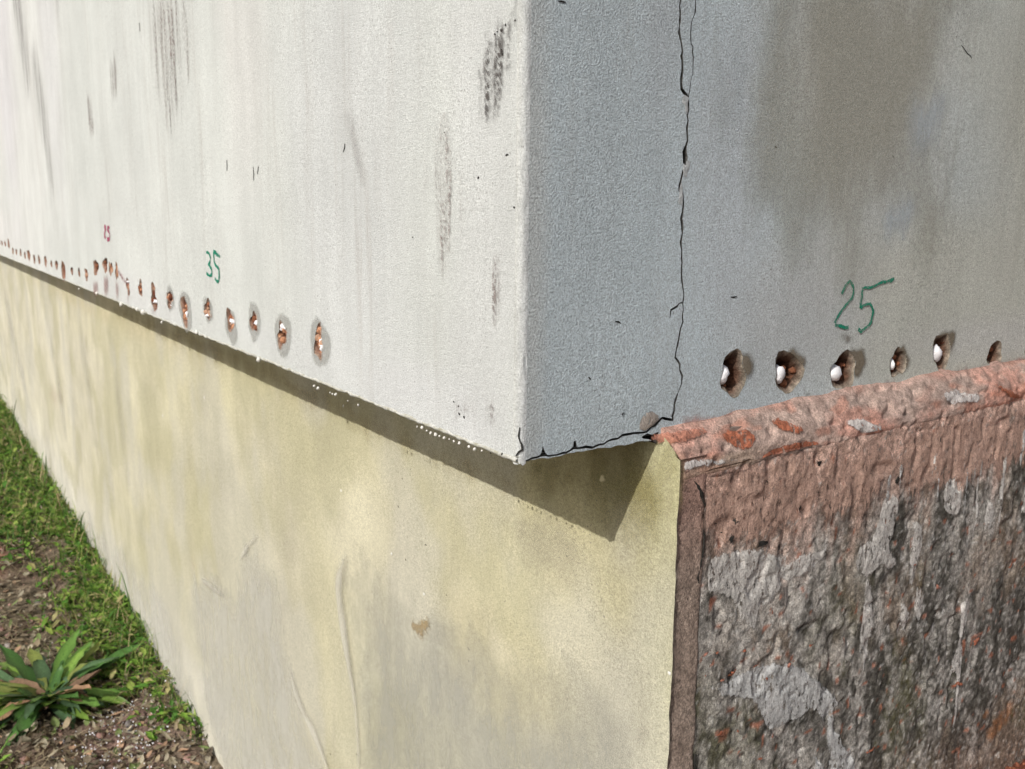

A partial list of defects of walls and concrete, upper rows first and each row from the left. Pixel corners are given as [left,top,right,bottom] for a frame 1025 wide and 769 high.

damp [154,2,188,94]
damp [483,25,510,115]
crack [515,0,696,461]
damp [113,565,170,669]